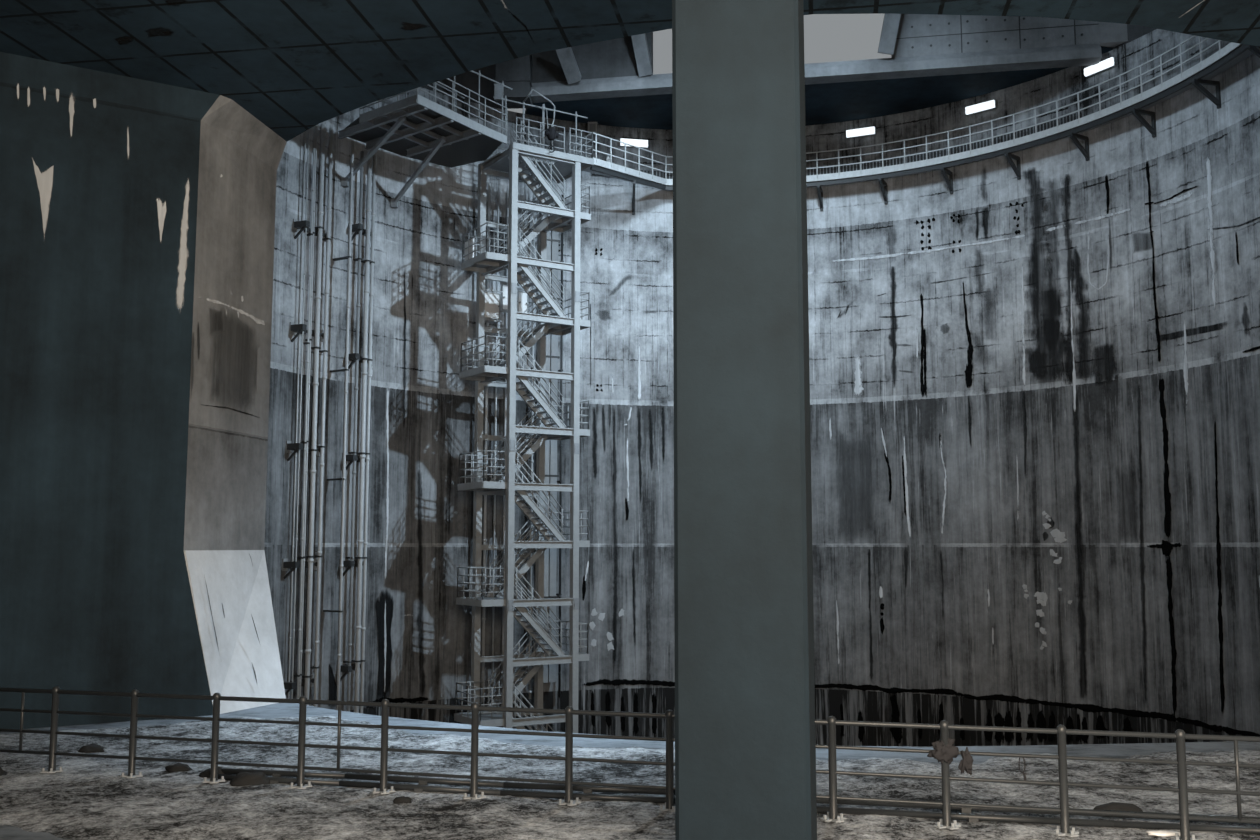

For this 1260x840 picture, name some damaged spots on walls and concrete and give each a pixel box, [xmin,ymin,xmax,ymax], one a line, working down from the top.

crack [1104,174,1112,269]
crack [1212,217,1260,264]
crack [1243,344,1260,353]
water stain [815,159,1260,745]
crack [1145,161,1198,719]
peeling [1042,511,1067,564]
peeling [589,608,625,651]
peeling [1022,584,1072,650]